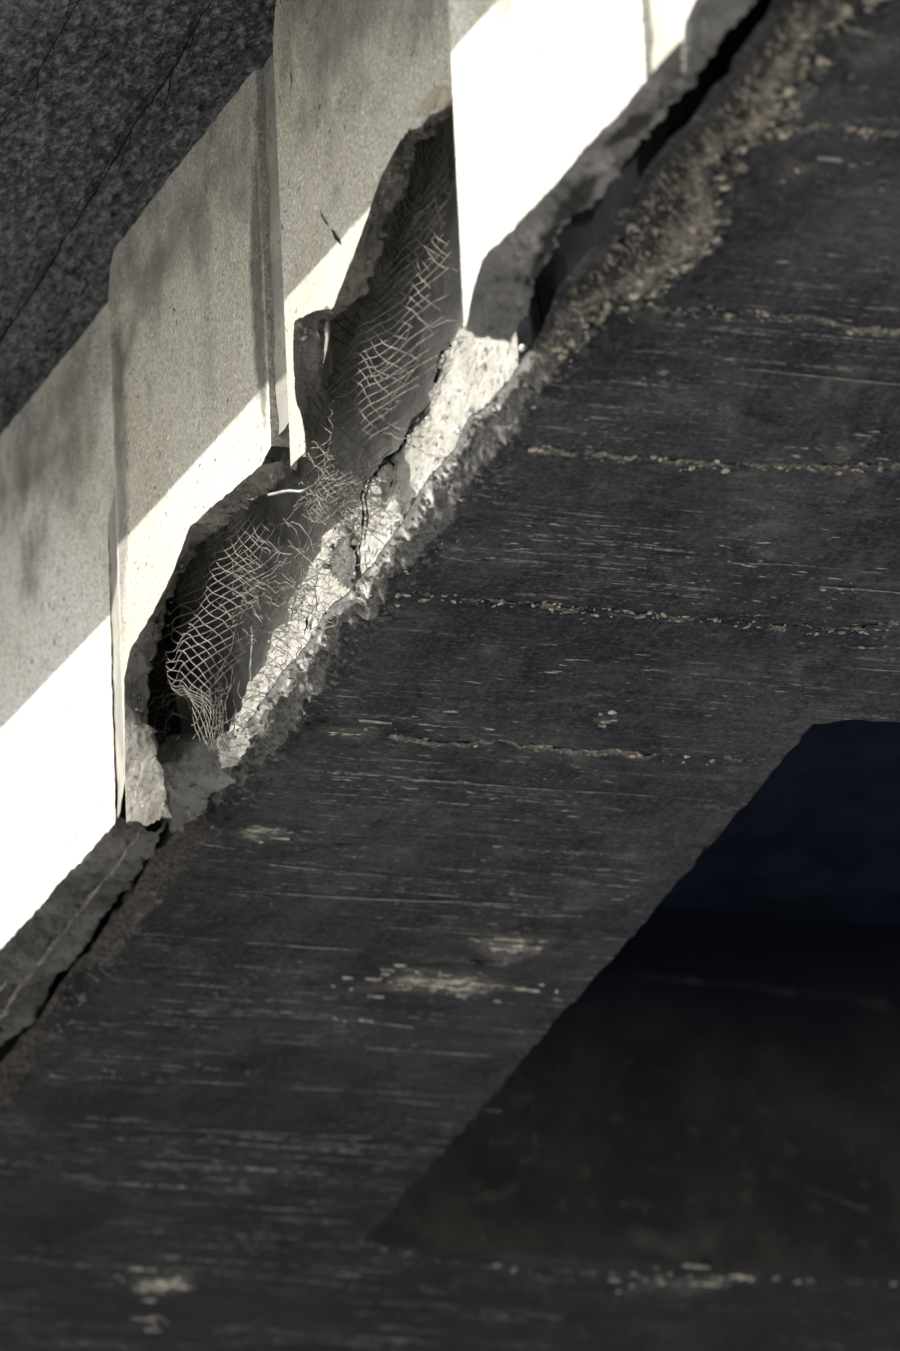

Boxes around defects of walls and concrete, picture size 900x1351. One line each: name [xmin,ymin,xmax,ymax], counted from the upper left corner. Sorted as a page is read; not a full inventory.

crack [0,829,142,1020]
spalling [0,0,879,1106]